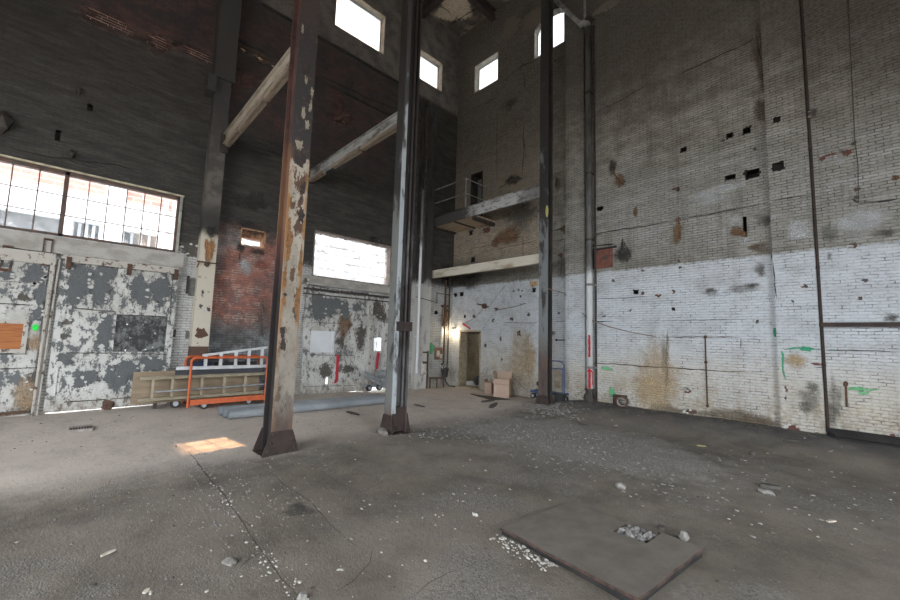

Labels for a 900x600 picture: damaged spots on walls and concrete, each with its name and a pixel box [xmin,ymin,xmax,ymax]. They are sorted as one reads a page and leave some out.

peeling [295,75,314,150]
corrosion [609,161,625,187]
corrosion [492,228,520,247]
peeling [0,262,49,321]
peeling [59,263,118,354]
peeling [127,270,175,310]
peeling [303,278,388,351]
peeling [55,352,75,367]
peeling [72,354,171,393]
peeling [317,362,355,380]
leakage [802,383,817,412]
crack [188,451,297,595]